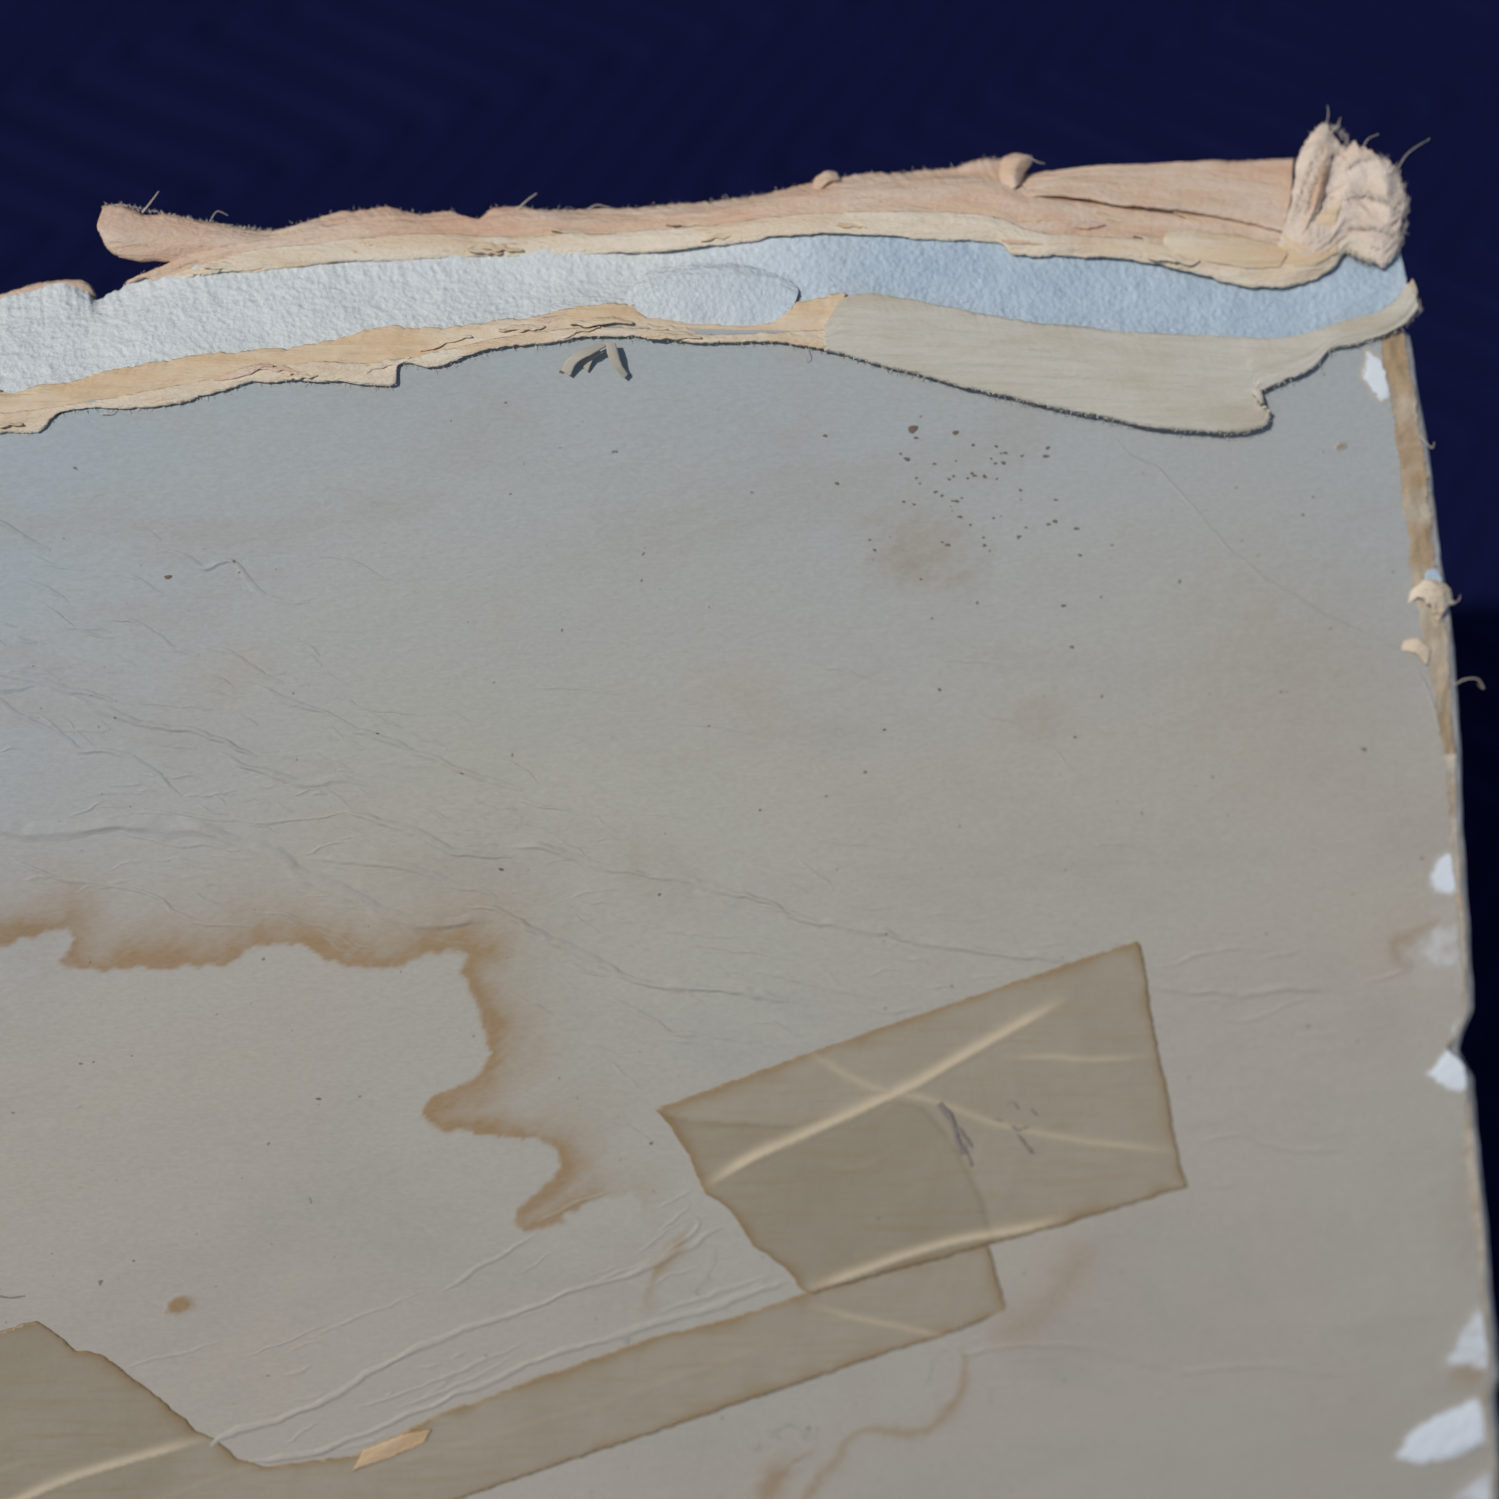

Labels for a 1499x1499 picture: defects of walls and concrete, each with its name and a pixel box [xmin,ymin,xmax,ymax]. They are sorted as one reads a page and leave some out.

peeling [97,205,278,262]
peeling [466,242,523,255]
peeling [1173,211,1204,223]
peeling [213,363,317,381]
spalling [1356,347,1390,406]
water stain [0,756,444,978]
spalling [1405,849,1464,991]
spalling [1421,1011,1467,1097]
water stain [417,966,758,1309]
water stain [708,1194,1172,1499]
spalling [1390,1301,1492,1499]